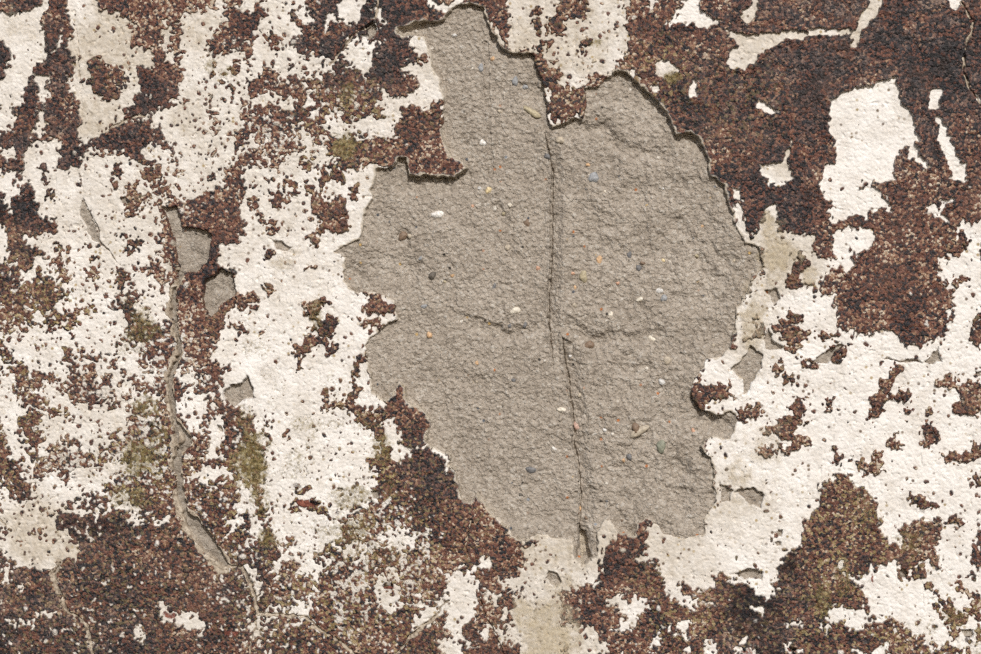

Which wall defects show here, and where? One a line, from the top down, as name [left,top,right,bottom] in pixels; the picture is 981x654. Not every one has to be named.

peeling [665,0,883,71]
crack [959,1,981,106]
peeling [760,138,794,187]
peeling [819,77,931,224]
peeling [928,88,968,183]
peeling [0,0,336,584]
crack [162,267,356,654]
spalling [184,0,763,654]
crack [545,134,590,561]
peeling [633,188,981,654]
crack [49,559,94,654]
crack [394,600,450,654]